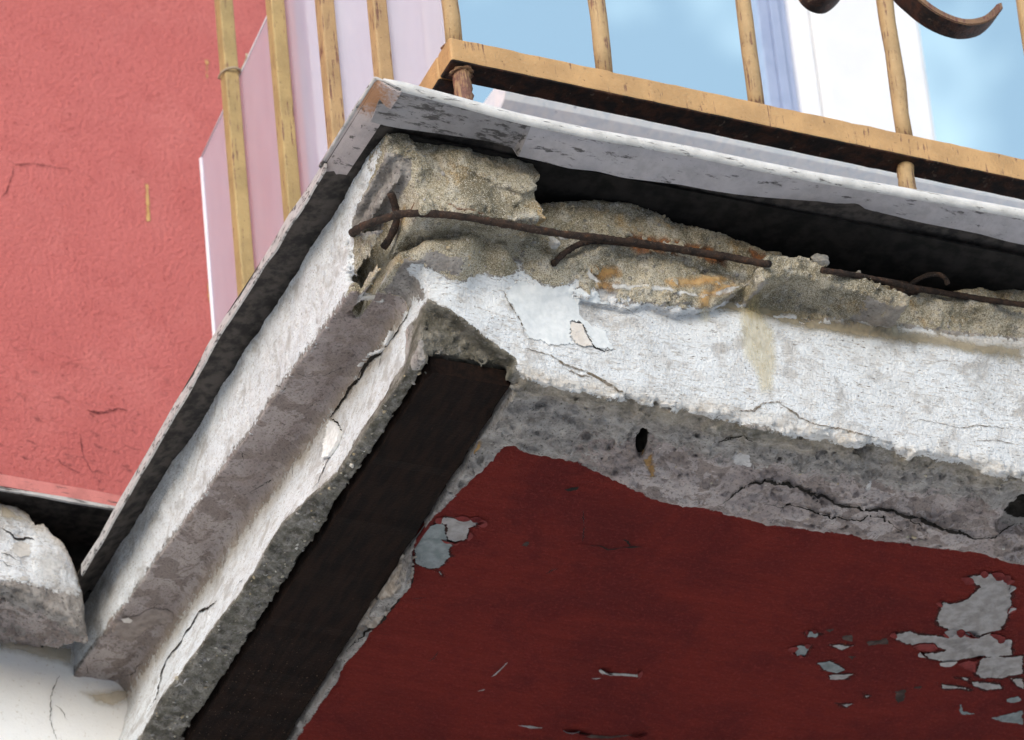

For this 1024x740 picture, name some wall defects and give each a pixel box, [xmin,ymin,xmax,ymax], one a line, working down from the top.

damp [588,270,697,296]
corrosion [629,234,730,306]
crack [276,310,409,431]
crack [504,292,632,400]
damp [716,286,1022,358]
spalling [137,133,1024,740]
crack [718,401,889,444]
crack [909,419,1023,445]
crack [719,479,1014,540]
crack [118,601,216,709]